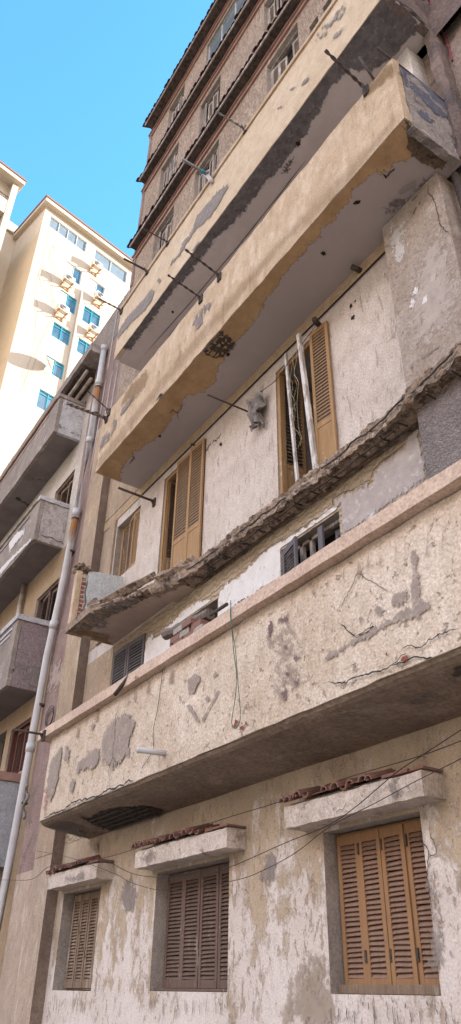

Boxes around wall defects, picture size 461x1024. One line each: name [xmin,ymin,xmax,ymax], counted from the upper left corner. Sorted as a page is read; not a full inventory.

spalling [400,67,448,170]
flaking render [168,185,229,269]
flaking render [116,278,161,341]
flaking render [191,303,210,335]
spalling [203,331,235,359]
flaking render [144,429,430,663]
crack [340,573,388,638]
crack [325,628,458,684]
flaking render [47,713,135,802]
spalling [78,806,167,832]